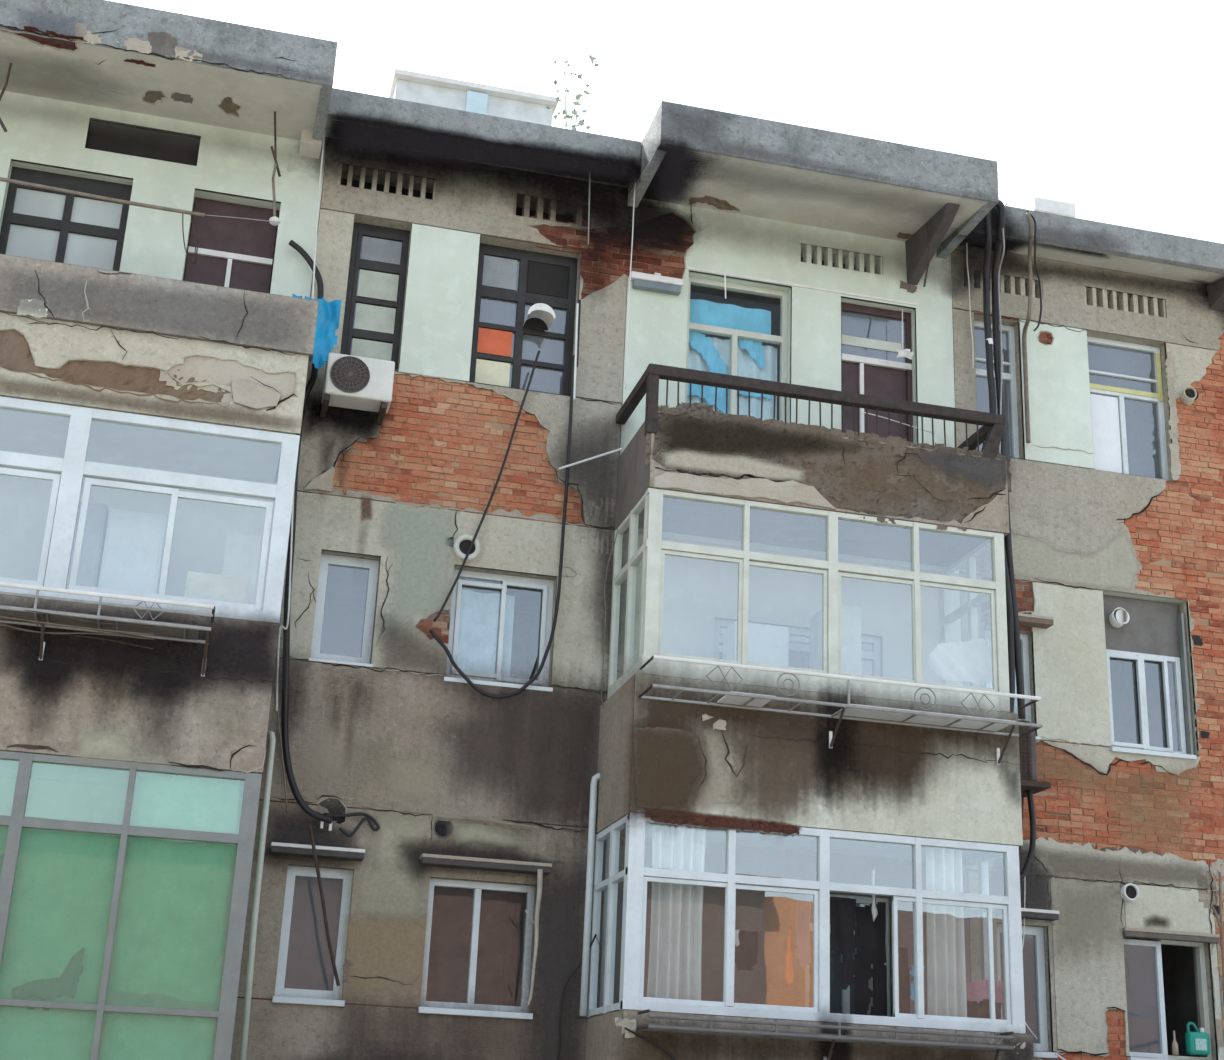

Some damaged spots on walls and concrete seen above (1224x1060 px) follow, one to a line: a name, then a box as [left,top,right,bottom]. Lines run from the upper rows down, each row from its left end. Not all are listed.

flaking render [527,195,740,300]
crack [1,270,309,362]
crack [252,377,297,411]
flaking render [304,371,612,530]
flaking render [645,405,1012,531]
crack [290,558,444,676]
damp [80,732,132,756]
damp [453,682,604,825]
damp [632,725,706,812]
damp [734,740,813,811]
crack [686,731,1011,811]
flaking render [1011,333,1224,1052]